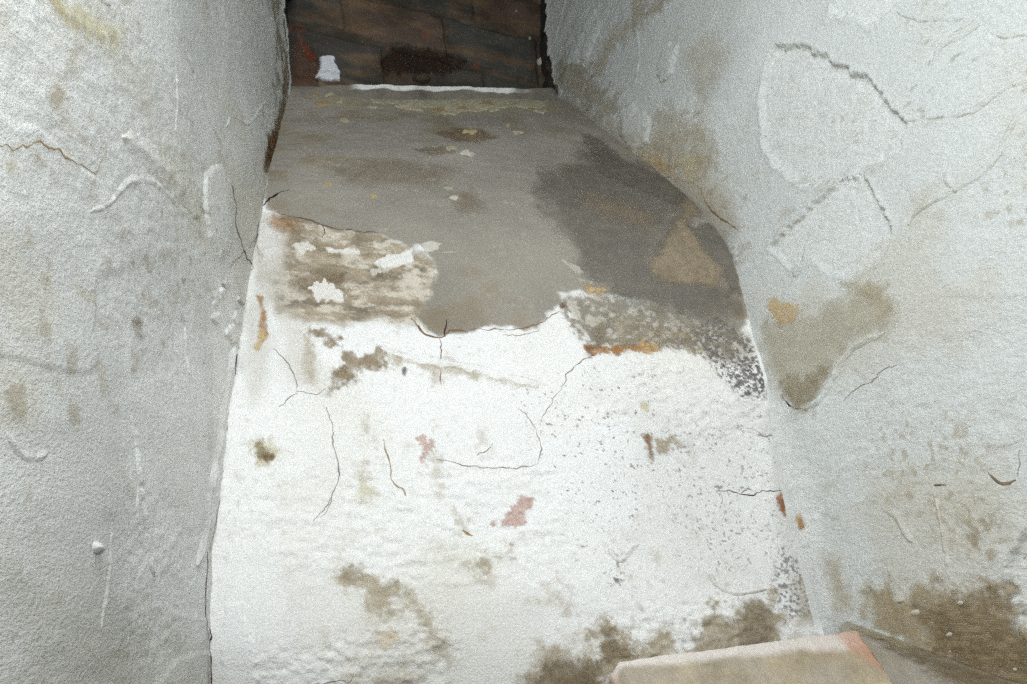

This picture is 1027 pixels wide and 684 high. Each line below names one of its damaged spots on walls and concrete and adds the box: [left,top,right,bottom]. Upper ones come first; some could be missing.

crack [0,139,106,175]
spalling [761,48,907,277]
peeling [291,241,360,257]
peeling [307,278,347,304]
peeling [364,248,414,276]
peeling [411,259,743,358]
water stain [539,134,767,399]
crack [436,355,593,469]
crack [383,439,406,496]
crack [719,489,781,509]
water stain [526,548,808,684]
water stain [857,576,1027,684]